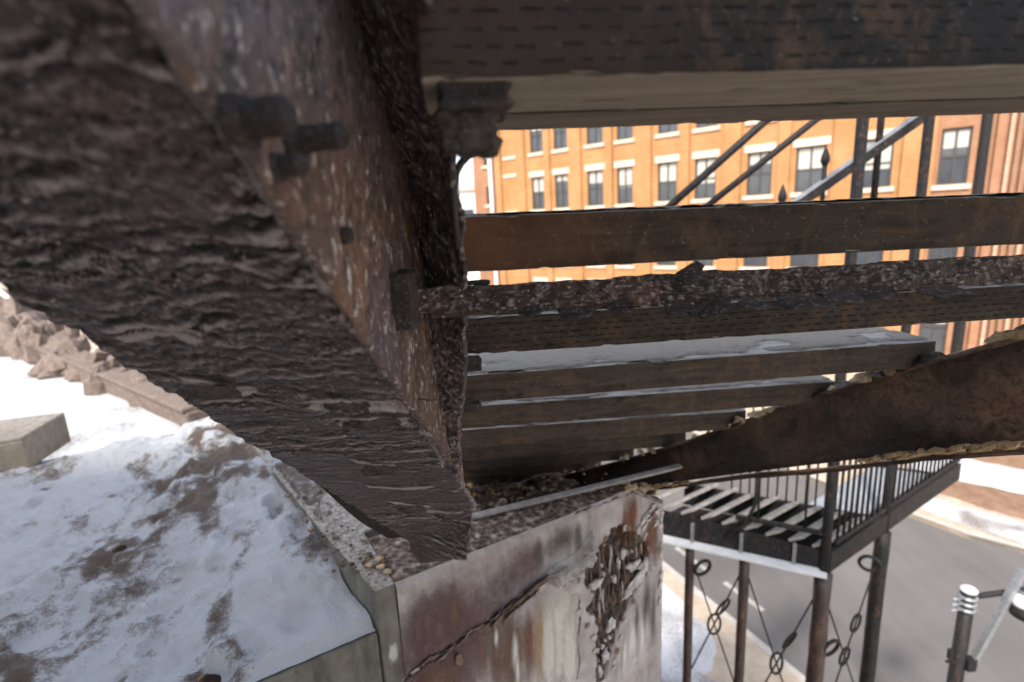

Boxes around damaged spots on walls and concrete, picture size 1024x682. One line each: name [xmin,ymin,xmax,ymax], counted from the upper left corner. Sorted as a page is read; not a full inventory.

rust [433,108,503,159]
rust [983,324,1024,343]
rust [826,369,905,391]
rust [690,405,789,439]
rust [619,448,656,460]
rust [857,440,1024,463]
rust [649,480,690,488]
rust [620,501,658,557]
rust [407,550,542,682]
crack [404,575,549,682]
crack [574,599,582,679]
spalling [572,504,664,682]